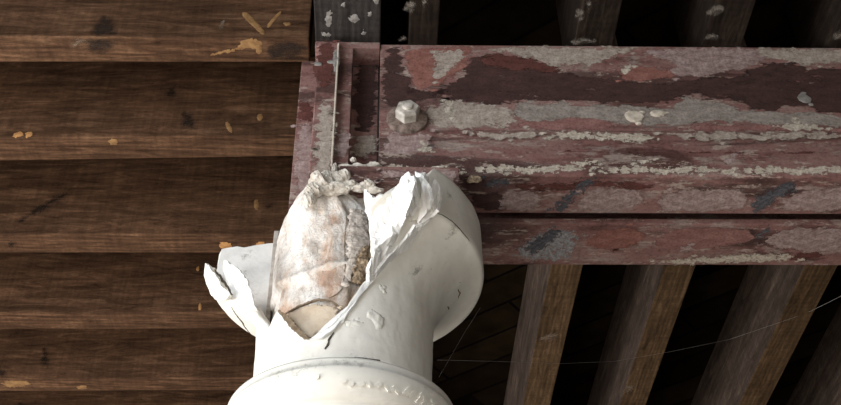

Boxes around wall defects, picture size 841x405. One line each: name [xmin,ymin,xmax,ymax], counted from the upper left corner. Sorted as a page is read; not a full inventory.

peeling [290,45,841,196]
spalling [204,261,258,311]
spalling [289,153,841,342]